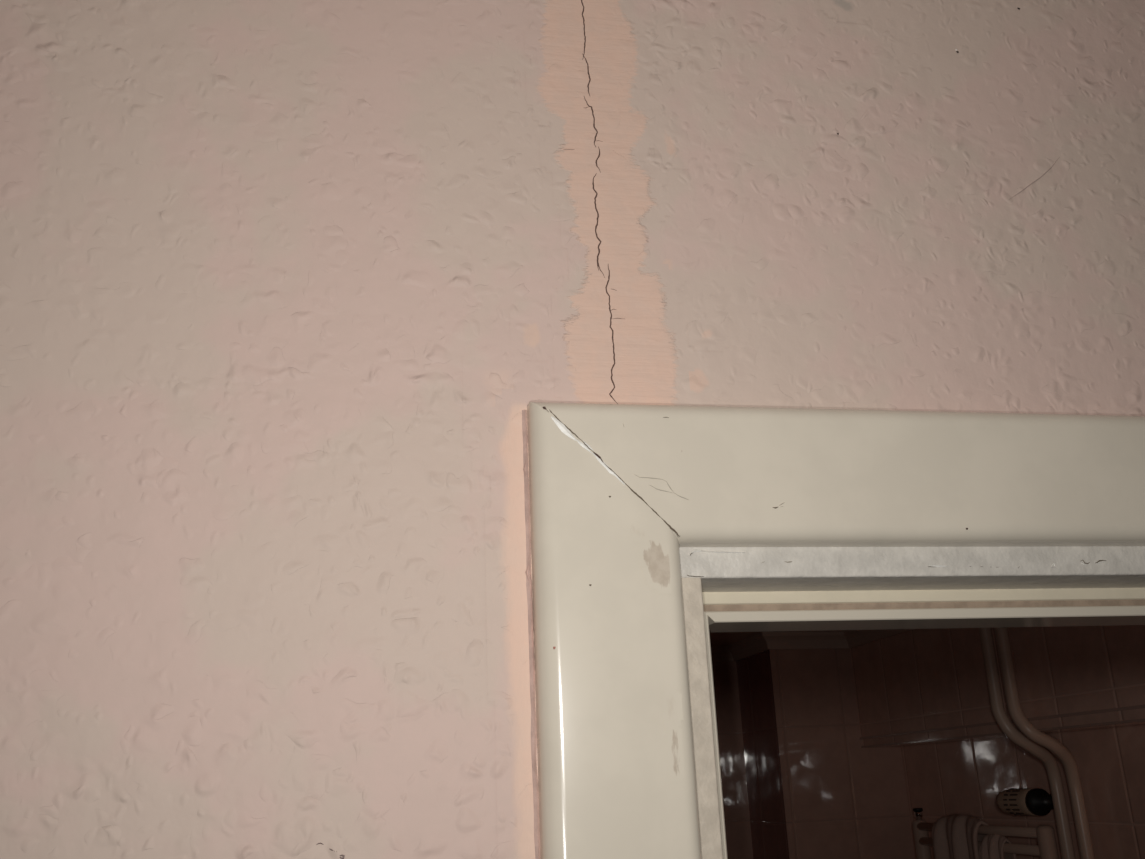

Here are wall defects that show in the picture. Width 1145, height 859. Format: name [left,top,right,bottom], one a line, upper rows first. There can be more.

crack [563,0,622,404]